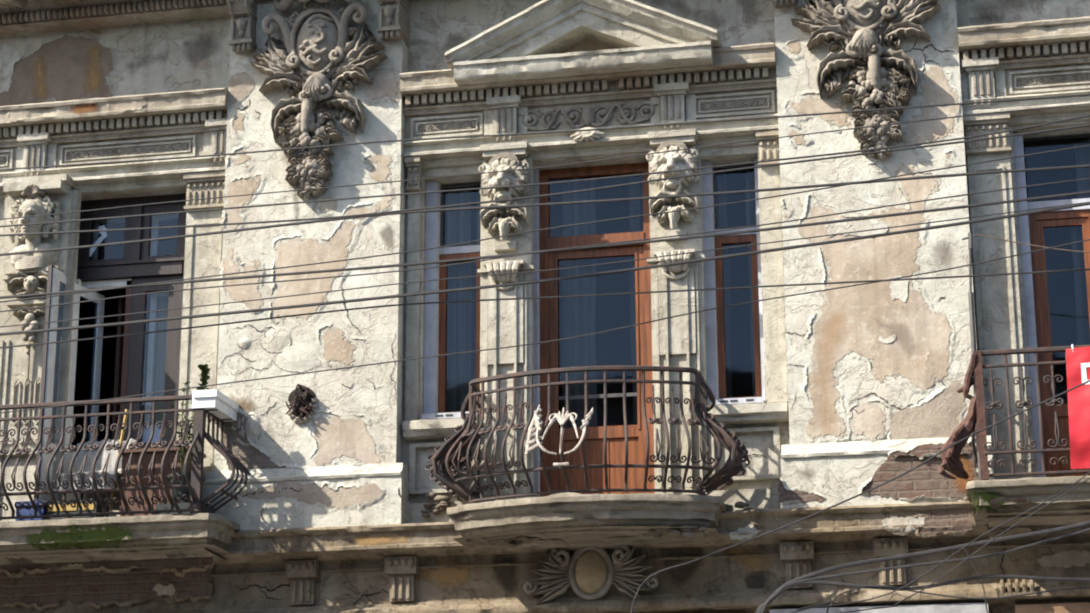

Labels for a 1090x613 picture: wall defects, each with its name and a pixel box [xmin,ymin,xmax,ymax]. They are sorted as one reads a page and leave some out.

flaking render [0,32,149,129]
peeling [220,69,267,235]
peeling [219,149,401,372]
peeling [778,60,1090,539]
crack [221,324,292,416]
crack [341,334,396,400]
flaking render [219,384,387,511]